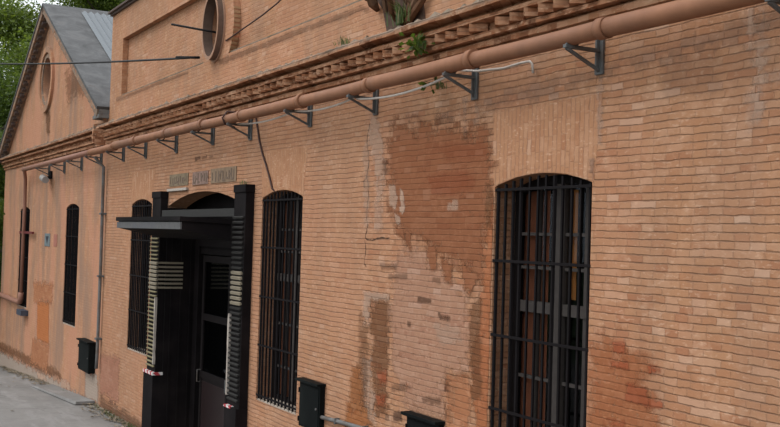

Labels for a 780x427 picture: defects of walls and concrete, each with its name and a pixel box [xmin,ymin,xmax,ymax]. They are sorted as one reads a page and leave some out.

crack [363,124,390,266]
peeling [383,114,498,295]